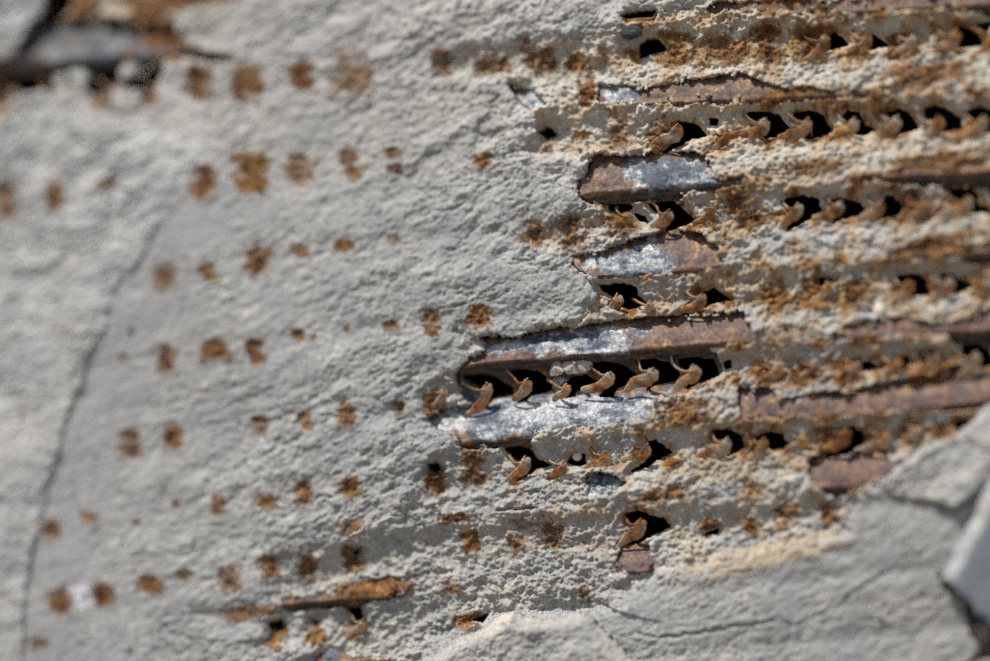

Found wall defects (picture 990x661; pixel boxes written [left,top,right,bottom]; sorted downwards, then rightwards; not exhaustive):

flaking render [0,0,46,61]
flaking render [61,0,240,67]
corrosion [657,0,825,68]
flaking render [120,60,140,82]
corrosion [471,36,596,106]
corrosion [187,151,272,206]
flaking render [0,66,216,661]
corrosion [464,304,495,330]
flaking render [255,0,990,661]
corrosion [459,445,488,491]
corrosion [437,512,483,554]
crack [611,543,921,638]